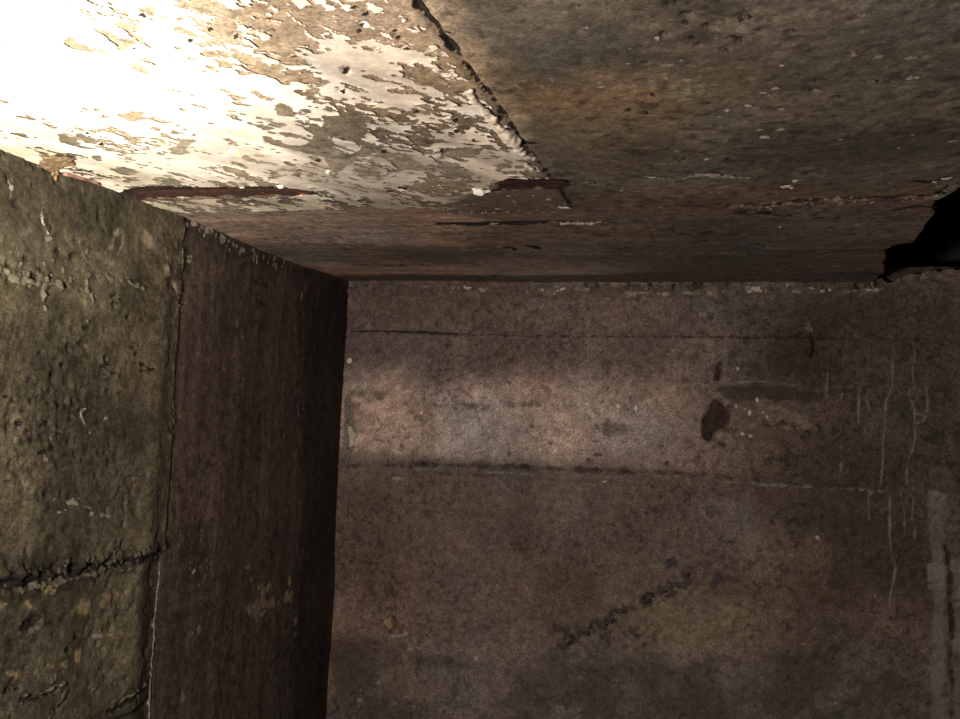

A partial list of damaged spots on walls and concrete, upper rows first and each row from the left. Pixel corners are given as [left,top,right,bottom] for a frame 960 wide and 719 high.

corrosion [123,186,318,202]
peeling [0,0,572,279]
crack [412,0,602,253]
corrosion [482,178,571,202]
crack [0,548,157,595]
water stain [857,342,930,614]